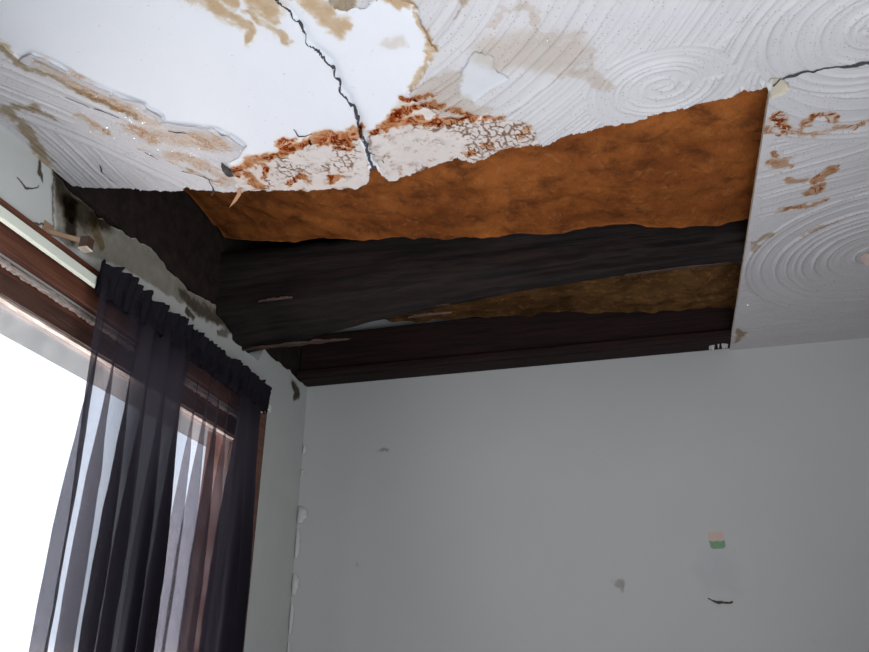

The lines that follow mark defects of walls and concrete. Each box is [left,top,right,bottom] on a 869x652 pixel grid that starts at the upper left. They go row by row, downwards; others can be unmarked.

flaking render [0,0,509,181]
crack [260,0,384,189]
corrosion [230,94,505,189]
crack [413,120,538,160]
corrosion [764,112,793,136]
crack [773,61,869,87]